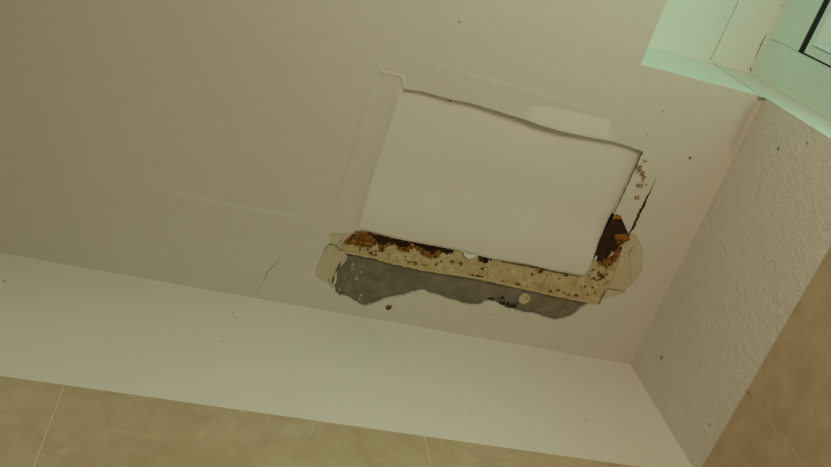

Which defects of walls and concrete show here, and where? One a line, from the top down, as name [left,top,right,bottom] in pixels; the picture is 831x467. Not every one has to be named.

crack [613,151,643,215]
crack [629,178,656,235]
corrosion [343,231,463,269]
spalling [315,230,585,319]
corrosion [549,214,630,296]
peeling [599,234,643,305]